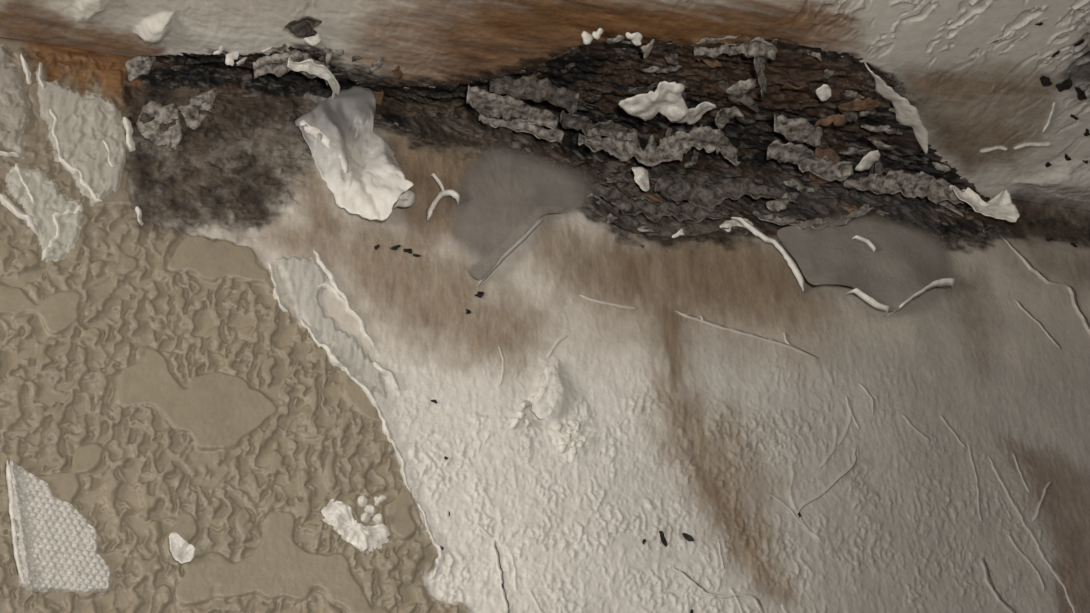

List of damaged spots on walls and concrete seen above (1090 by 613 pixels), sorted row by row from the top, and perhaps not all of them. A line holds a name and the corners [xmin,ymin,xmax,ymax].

corrosion [0,4,160,96]
leakage [296,44,570,91]
corrosion [365,0,841,81]
leakage [873,39,1090,163]
leakage [374,113,571,233]
spalling [0,16,1020,317]
leakage [862,194,1090,251]
leakage [350,233,531,351]
crack [1014,299,1061,349]
crack [999,235,1090,336]
peeling [267,249,445,581]
peeling [169,532,195,564]